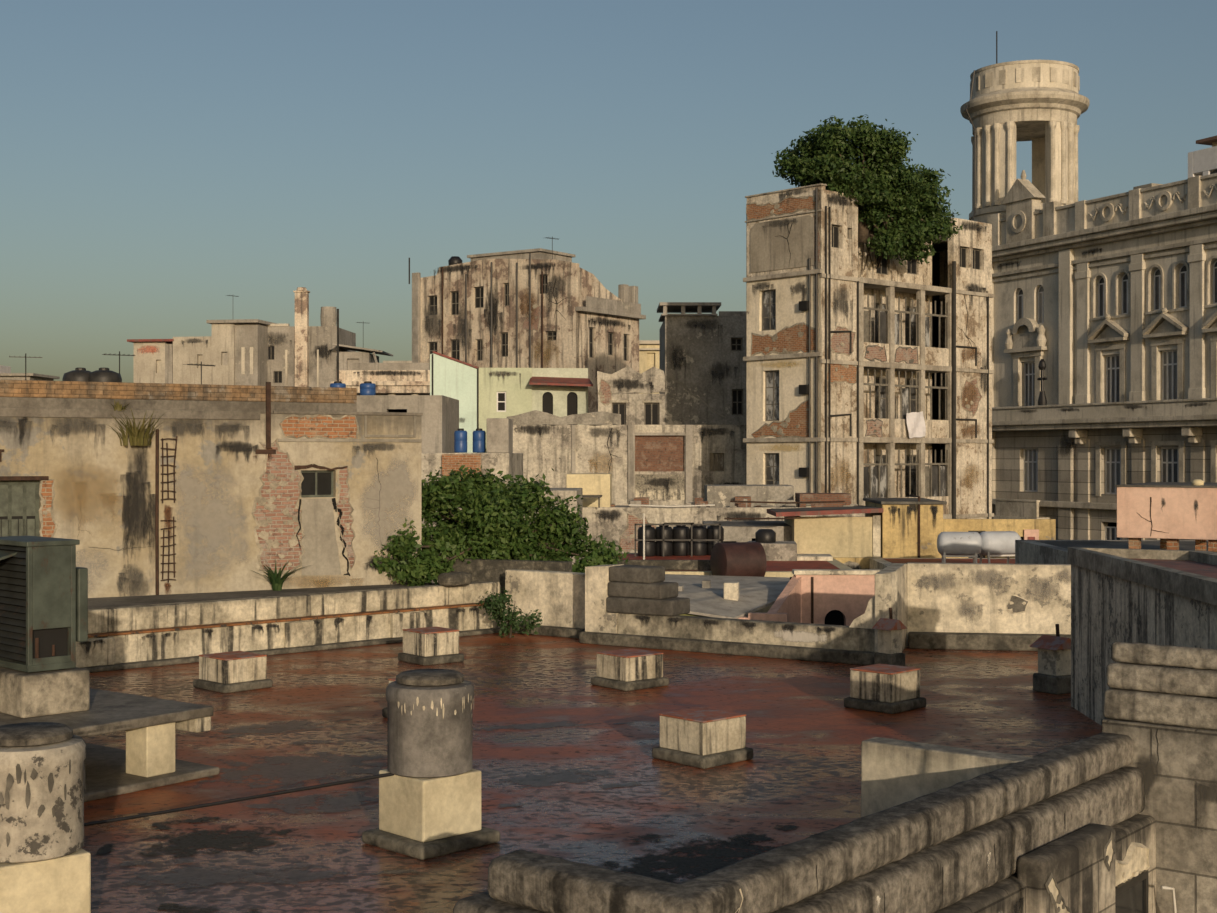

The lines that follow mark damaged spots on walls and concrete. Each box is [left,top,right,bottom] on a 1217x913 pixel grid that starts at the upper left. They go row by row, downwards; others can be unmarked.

damp [434,265,477,281]
damp [425,306,472,345]
damp [484,292,503,331]
spalling [751,322,919,385]
damp [0,397,357,459]
spalling [751,399,809,438]
spalling [39,479,58,538]
damp [122,448,155,545]
crack [294,499,302,548]
spalling [251,414,359,574]
crack [332,458,383,576]
crack [1139,497,1165,536]